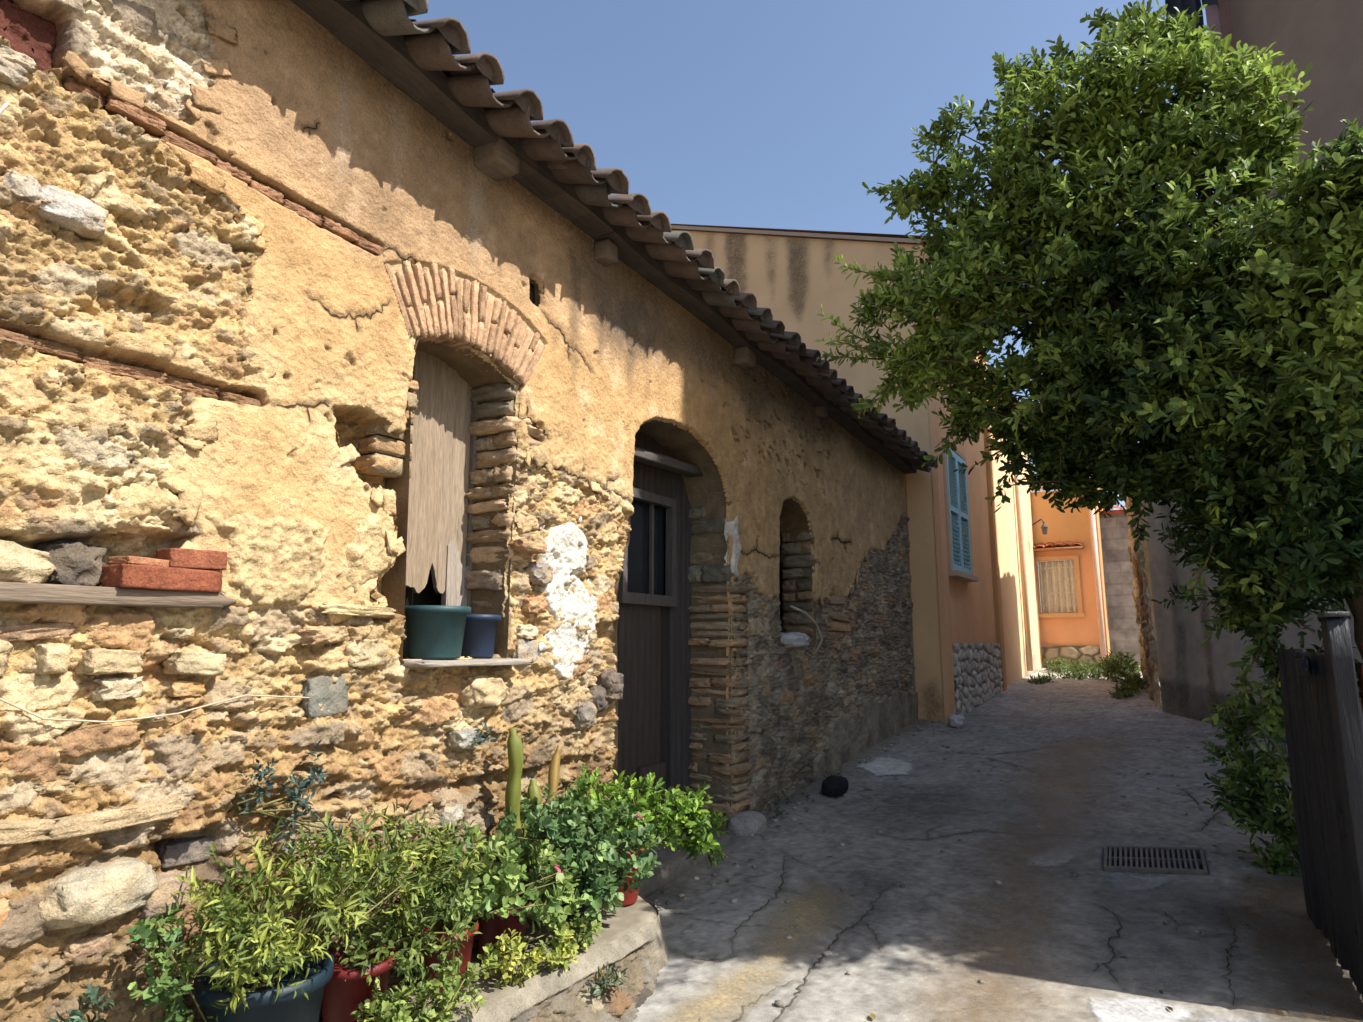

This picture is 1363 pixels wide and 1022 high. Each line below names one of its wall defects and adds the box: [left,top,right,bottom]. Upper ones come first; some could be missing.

flaking render [0,0,384,565]
crack [308,295,389,330]
crack [542,311,590,370]
damp [789,238,807,310]
flaking render [724,513,916,831]
crack [676,854,812,961]
crack [732,883,892,1022]
crack [1093,902,1238,1008]